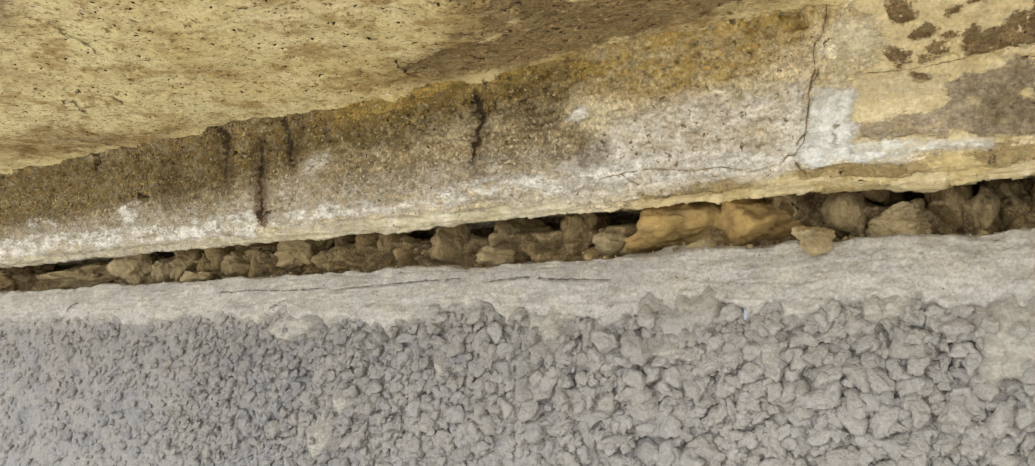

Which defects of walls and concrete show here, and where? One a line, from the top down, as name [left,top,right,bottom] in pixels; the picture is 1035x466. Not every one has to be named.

crack [216,127,230,174]
crack [256,139,276,226]
crack [280,115,292,162]
crack [471,93,486,162]
water stain [0,10,993,268]
crack [594,4,827,185]